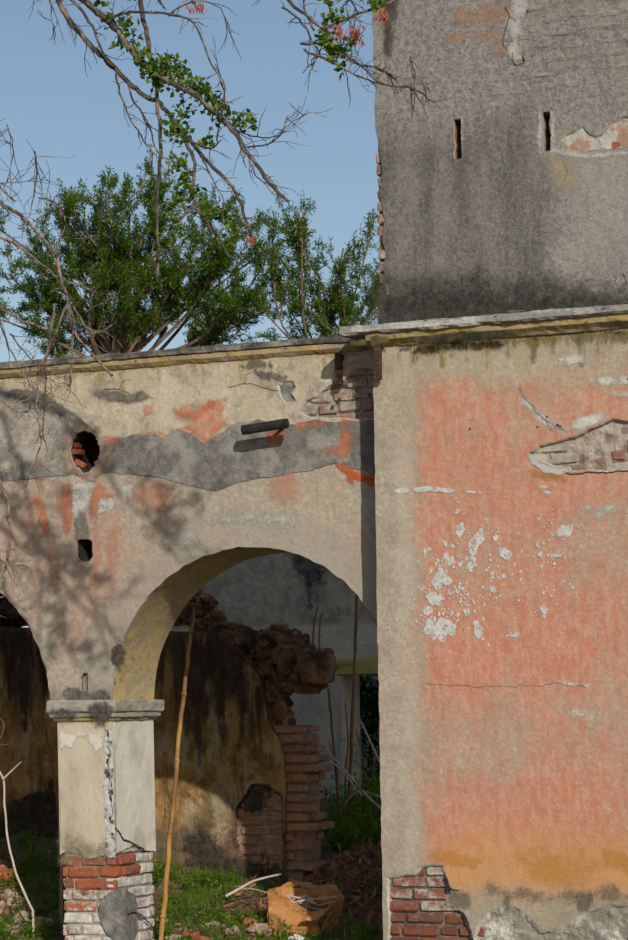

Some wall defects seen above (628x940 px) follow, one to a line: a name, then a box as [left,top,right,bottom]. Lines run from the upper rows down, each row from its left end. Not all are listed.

flaking render [536,111,628,158]
water stain [323,275,628,366]
flaking render [0,367,375,519]
flaking render [521,398,628,475]
water stain [292,555,326,609]
peeling [388,486,623,667]
water stain [51,688,114,723]
water stain [180,635,261,765]
crack [425,682,591,690]
flaking render [59,728,154,940]
water stain [183,826,284,879]
flaking render [386,864,628,940]